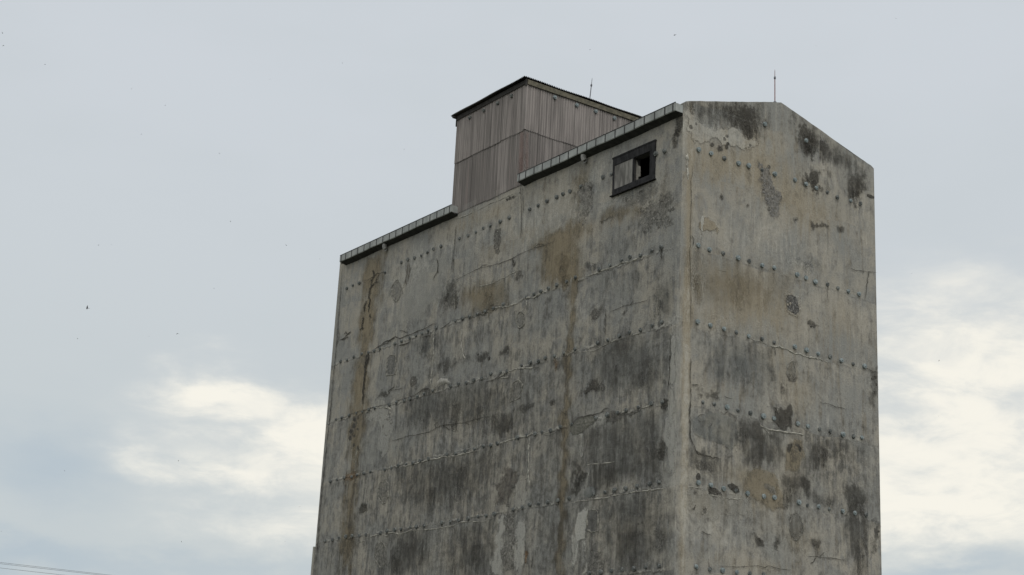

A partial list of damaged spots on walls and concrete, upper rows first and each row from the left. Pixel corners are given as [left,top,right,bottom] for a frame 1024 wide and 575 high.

leakage [672,101,764,148]
spalling [758,163,782,217]
leakage [792,111,867,198]
spalling [785,293,816,328]
crack [315,184,549,574]
crack [668,334,737,459]
leakage [734,404,829,529]